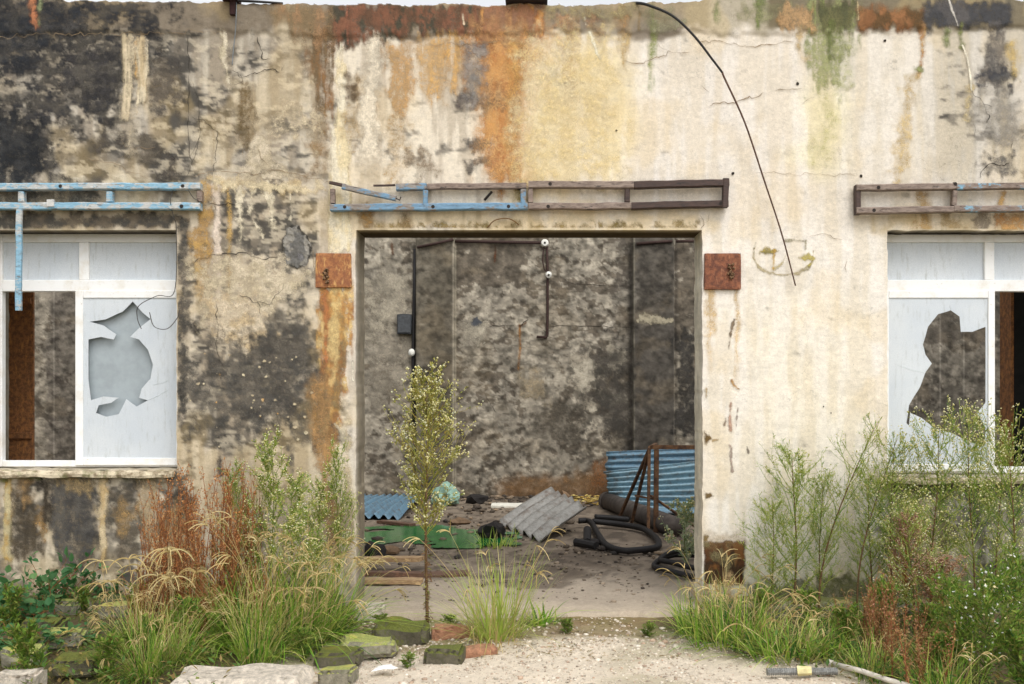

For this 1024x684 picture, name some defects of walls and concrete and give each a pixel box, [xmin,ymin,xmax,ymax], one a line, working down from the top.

leakage [0,0,195,229]
crack [0,29,328,210]
rust [263,3,636,197]
leakage [304,8,687,253]
crack [703,87,814,106]
rust [857,2,927,184]
leakage [922,0,1024,176]
spalling [282,225,312,268]
leakage [177,312,340,452]
rust [307,285,354,556]
leakage [0,472,200,593]
rust [704,540,746,606]